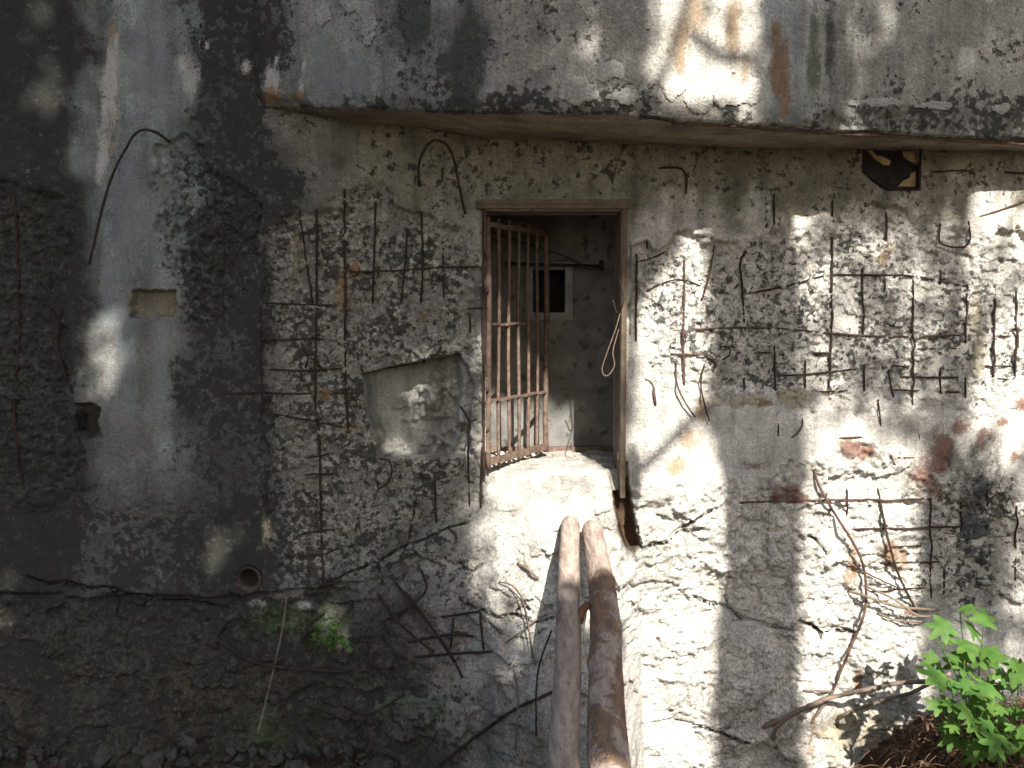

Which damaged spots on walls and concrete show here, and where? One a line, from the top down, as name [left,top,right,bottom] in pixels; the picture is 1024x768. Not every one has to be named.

leakage [264,57,280,95]
leakage [393,0,496,114]
peeling [556,59,1024,187]
spalling [0,128,494,768]
crack [641,510,712,551]
spalling [614,193,1024,768]
crack [698,599,853,636]